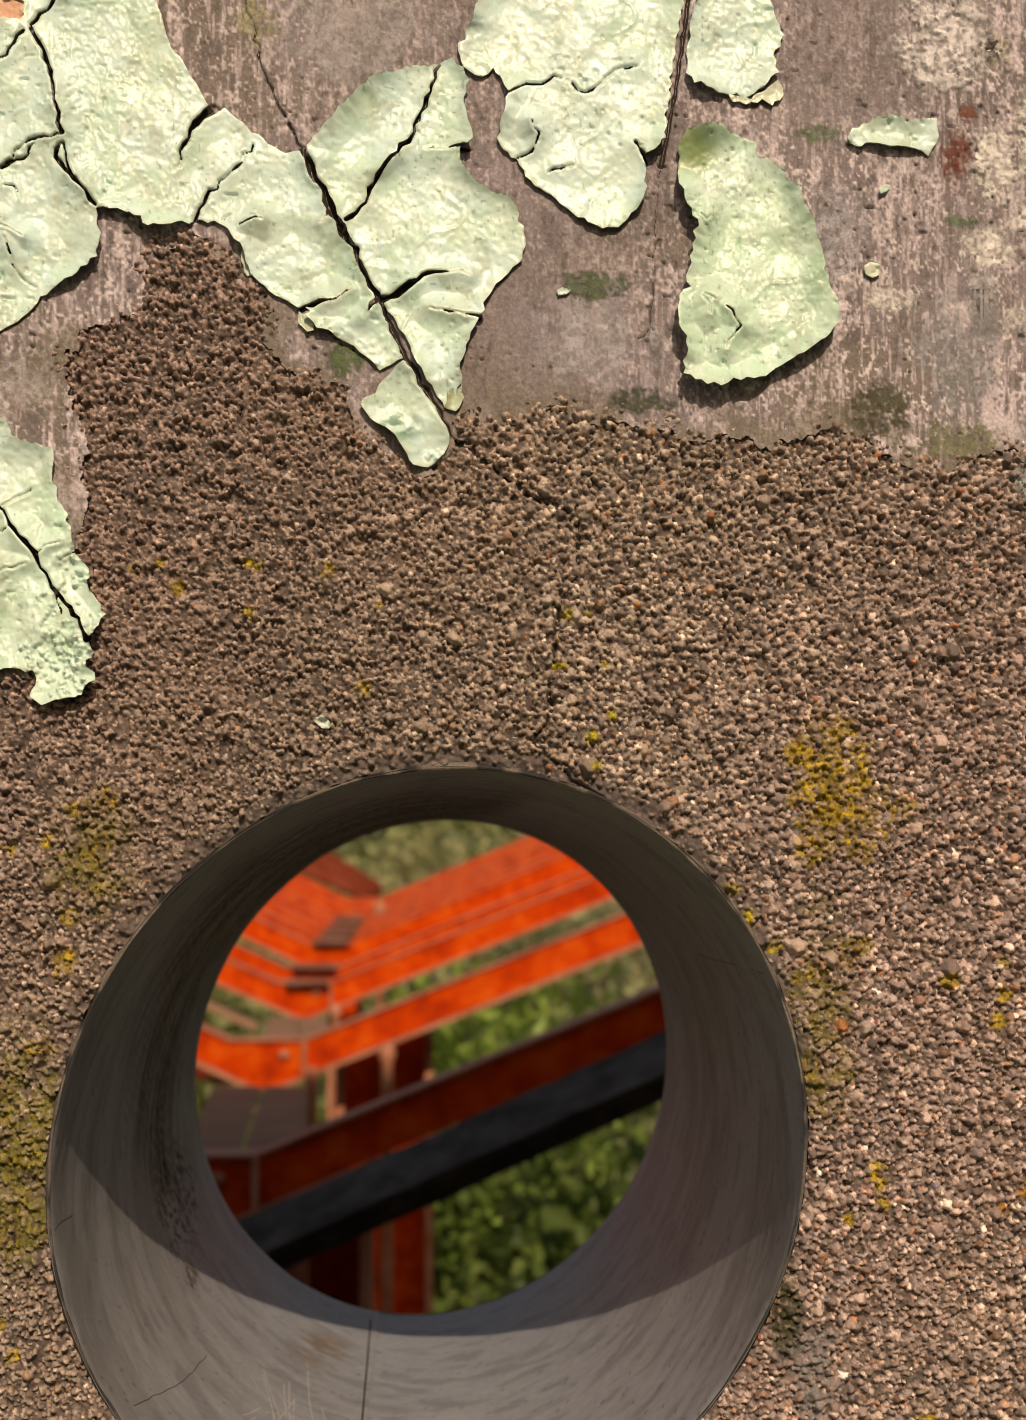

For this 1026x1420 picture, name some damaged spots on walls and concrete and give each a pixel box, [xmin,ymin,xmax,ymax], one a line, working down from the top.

peeling [685,0,784,106]
peeling [0,0,403,371]
peeling [307,0,685,411]
crack [636,0,690,339]
peeling [677,122,840,386]
peeling [863,262,881,278]
peeling [360,360,449,468]
crack [245,1,594,789]
peeling [0,509,95,705]
peeling [0,418,106,636]
peeling [313,715,331,729]